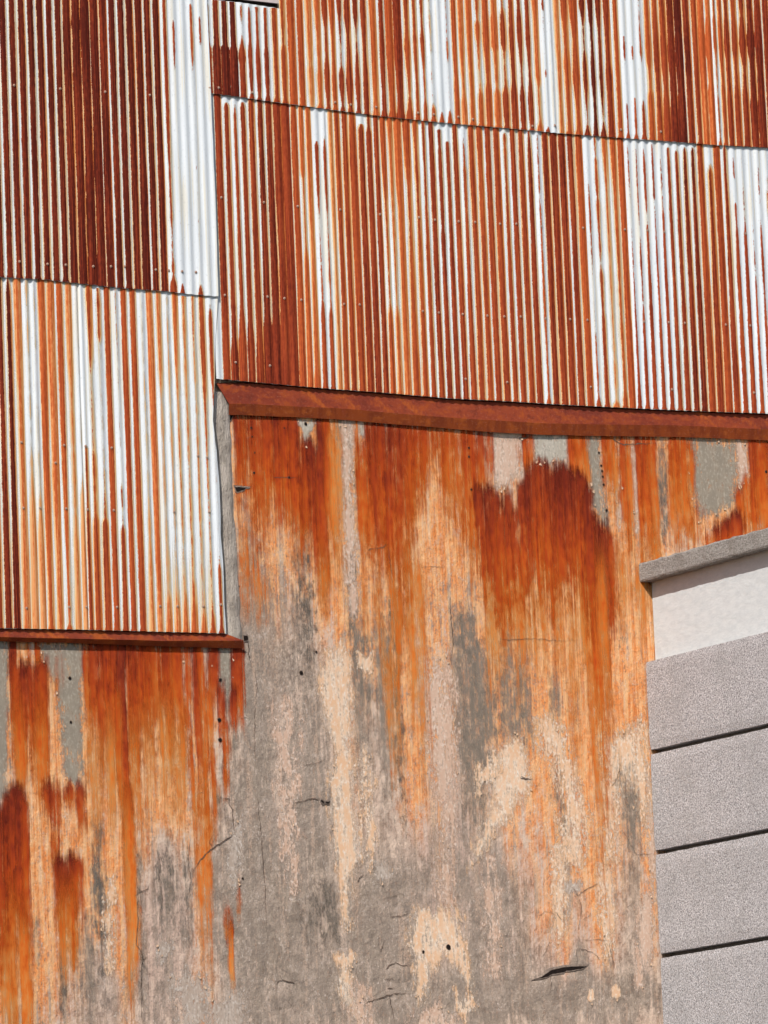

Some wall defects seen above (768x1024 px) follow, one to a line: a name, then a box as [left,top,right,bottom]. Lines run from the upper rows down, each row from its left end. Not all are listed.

rust [0,0,768,633]
rust [355,421,768,822]
rust [0,642,245,1024]
crack [188,798,235,897]
crack [539,881,614,990]